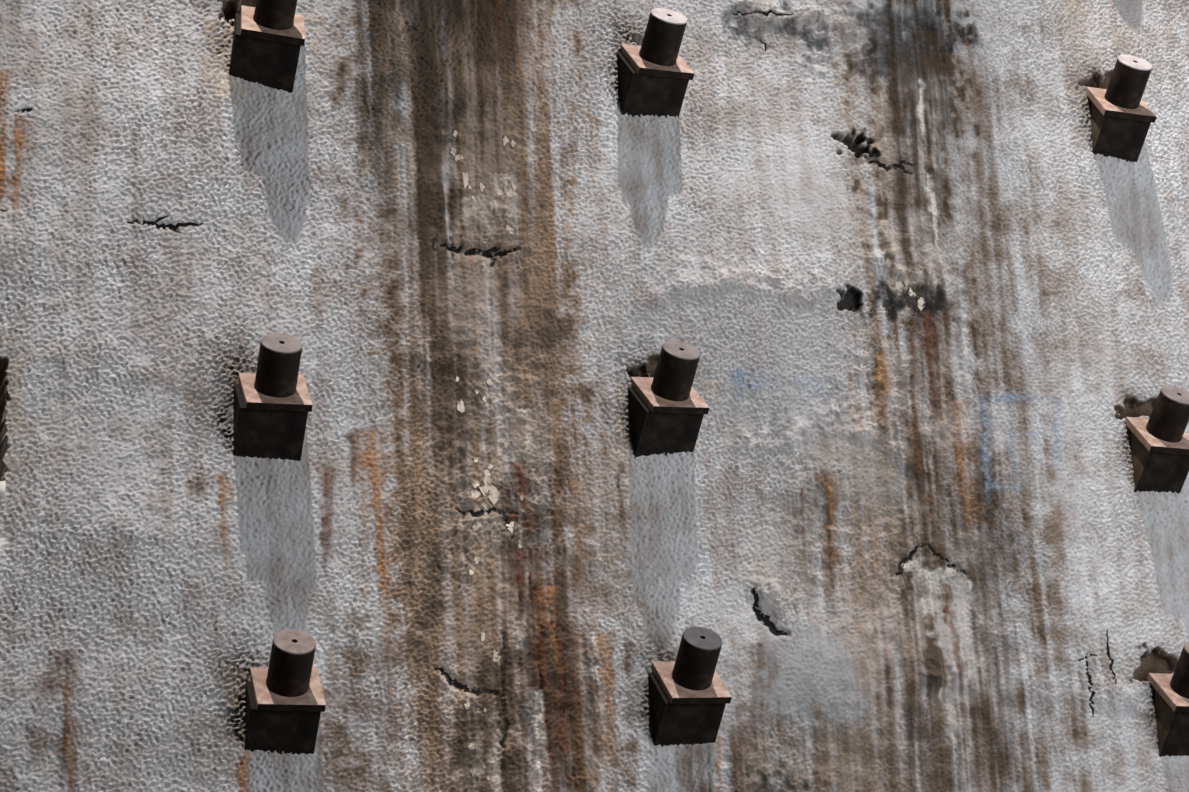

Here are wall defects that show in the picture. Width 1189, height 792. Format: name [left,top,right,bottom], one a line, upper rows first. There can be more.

water stain [780,20,822,46]
rust [0,72,25,207]
water stain [359,0,454,246]
water stain [857,0,963,265]
crack [440,243,516,267]
water stain [871,282,945,326]
water stain [433,341,467,450]
rust [349,431,389,591]
water stain [904,563,949,615]
water stain [480,625,532,718]
rust [520,580,587,792]
water stain [503,749,540,792]